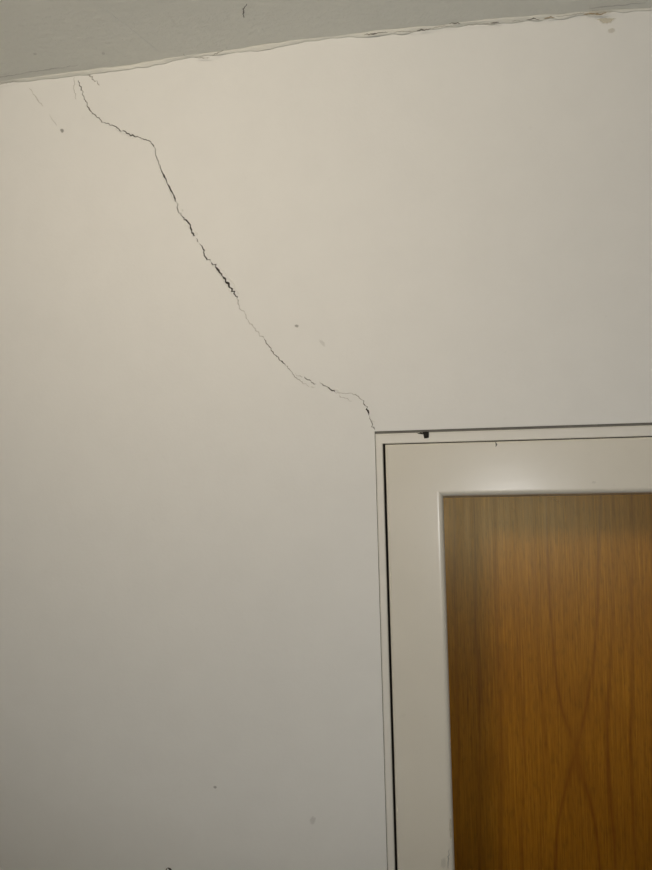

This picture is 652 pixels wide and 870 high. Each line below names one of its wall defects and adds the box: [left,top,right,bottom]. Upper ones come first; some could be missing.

crack [0,65,375,429]